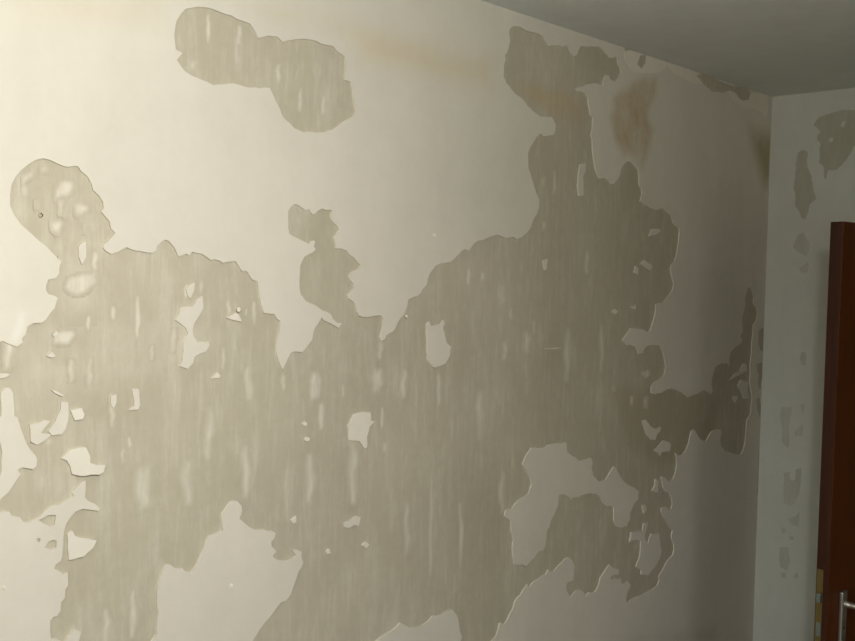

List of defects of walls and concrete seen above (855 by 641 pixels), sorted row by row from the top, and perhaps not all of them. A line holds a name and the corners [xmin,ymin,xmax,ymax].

peeling [174,7,355,133]
peeling [504,26,620,87]
peeling [624,50,750,101]
damp [605,71,660,176]
peeling [813,110,855,179]
peeling [794,150,816,219]
peeling [0,72,757,641]